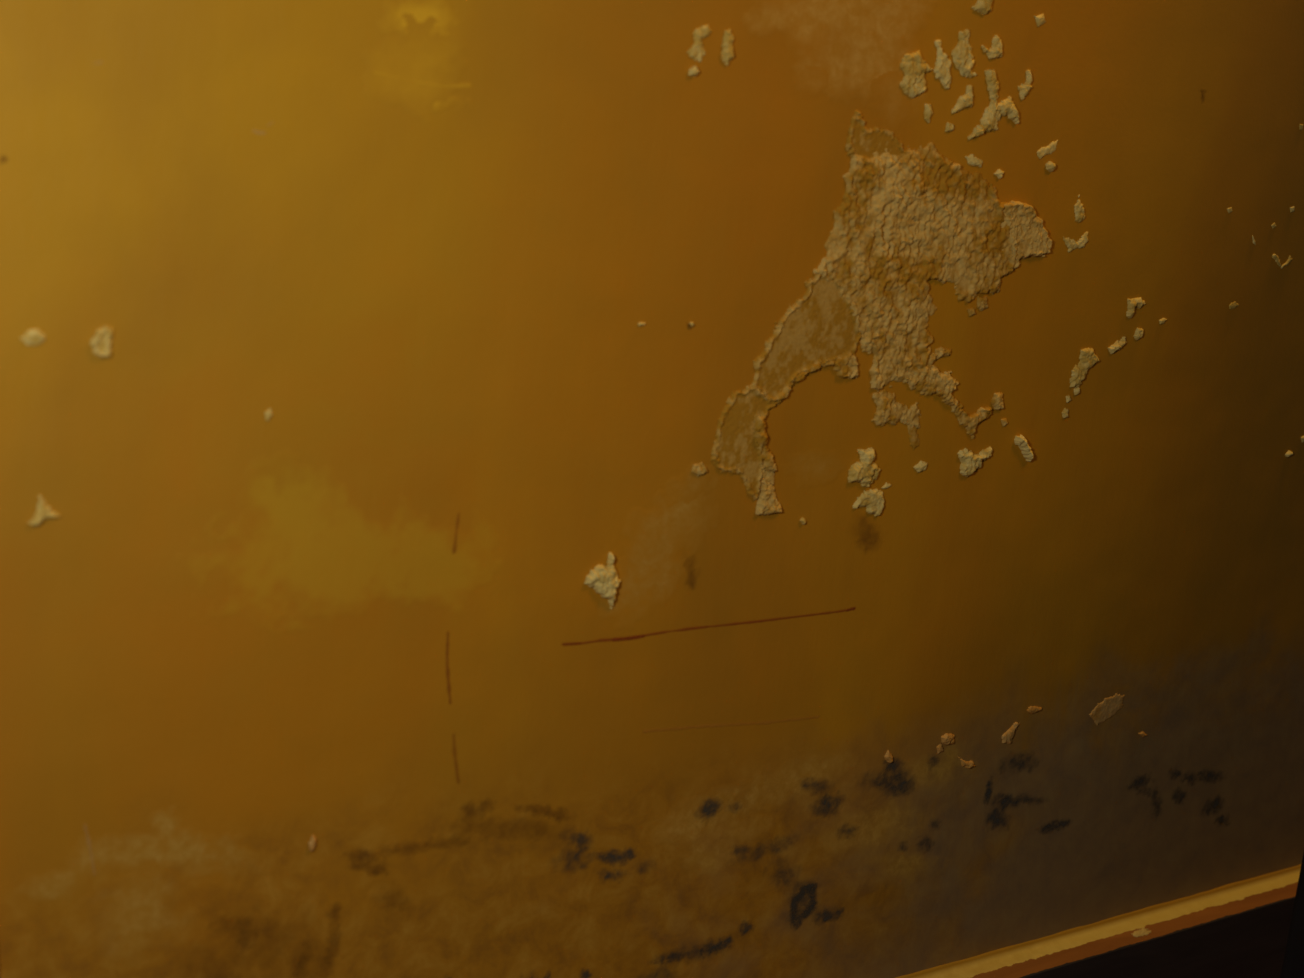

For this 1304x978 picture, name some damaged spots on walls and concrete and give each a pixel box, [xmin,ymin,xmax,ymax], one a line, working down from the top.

peeling [687,24,734,77]
peeling [691,29,1088,516]
peeling [19,329,46,346]
peeling [90,325,114,358]
peeling [1062,297,1146,418]
peeling [27,495,61,527]
peeling [584,552,621,609]
crack [573,608,855,644]
peeling [1001,706,1042,744]
leakage [651,737,980,887]
leakage [14,805,265,968]
leakage [791,884,843,926]